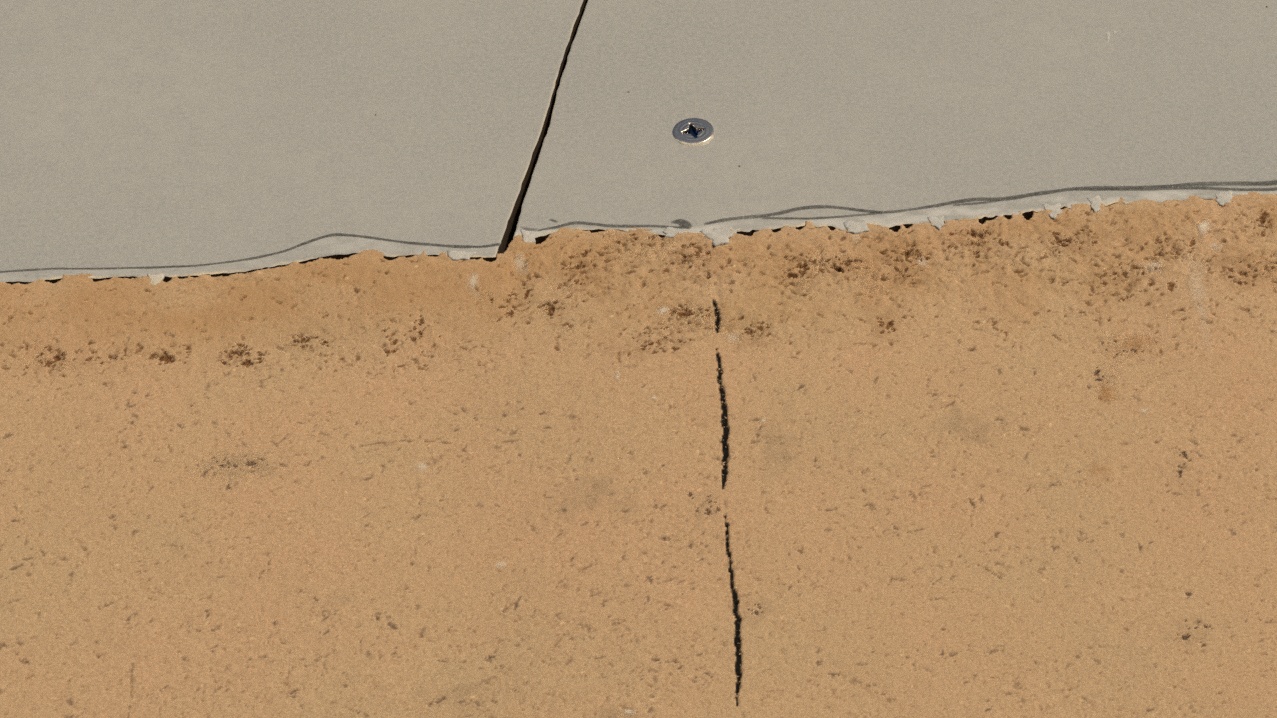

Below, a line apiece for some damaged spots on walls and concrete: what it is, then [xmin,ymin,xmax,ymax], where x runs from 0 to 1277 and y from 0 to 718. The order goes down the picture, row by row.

crack [708,277,742,706]